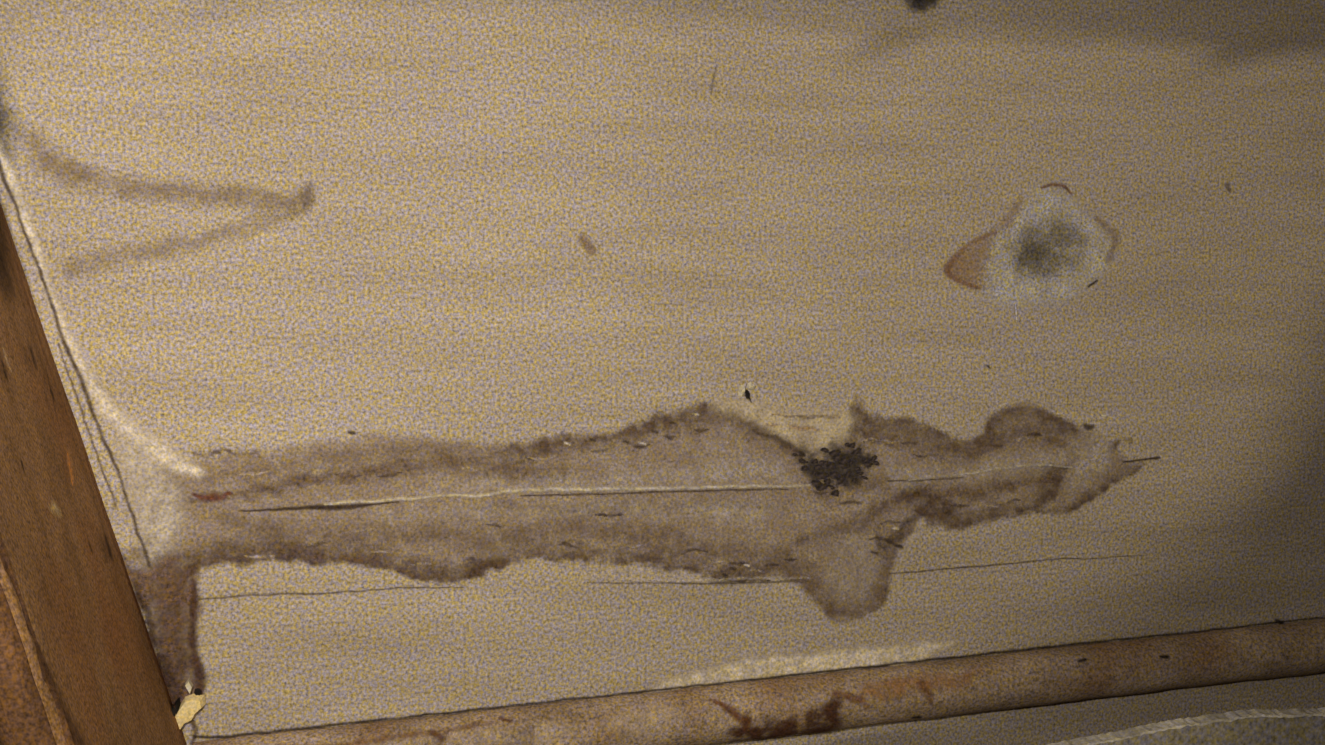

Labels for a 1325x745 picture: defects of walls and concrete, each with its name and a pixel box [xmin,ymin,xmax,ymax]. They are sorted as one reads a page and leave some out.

damp [621,416,675,448]
damp [748,409,893,504]
damp [193,492,231,500]
damp [870,476,1062,554]
damp [617,545,818,592]
damp [125,544,508,703]
corrosion [713,693,861,741]